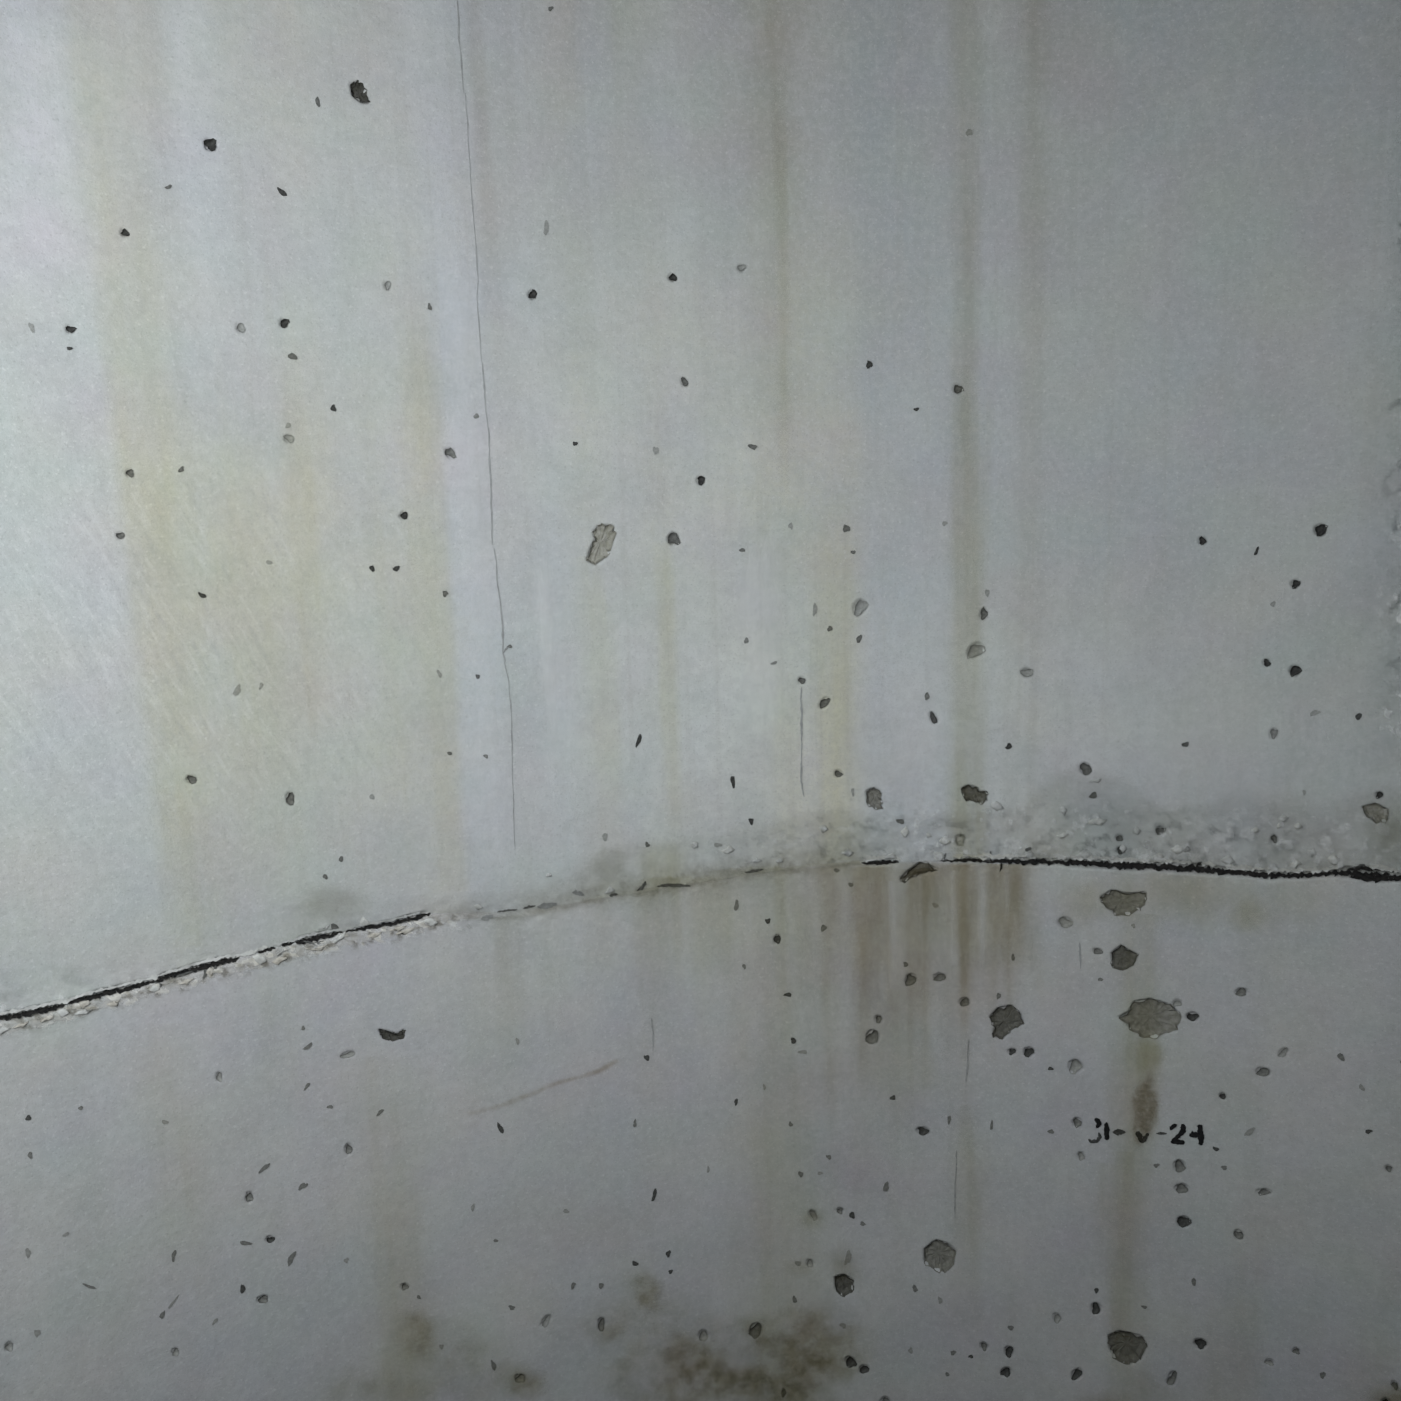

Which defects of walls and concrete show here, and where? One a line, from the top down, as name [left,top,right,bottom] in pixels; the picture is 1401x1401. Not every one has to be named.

leakage [842,849,901,863]
crack [862,858,899,866]
leakage [926,827,1340,875]
crack [941,851,1401,883]
leakage [1368,864,1398,873]
crack [481,881,690,921]
crack [0,913,430,1021]